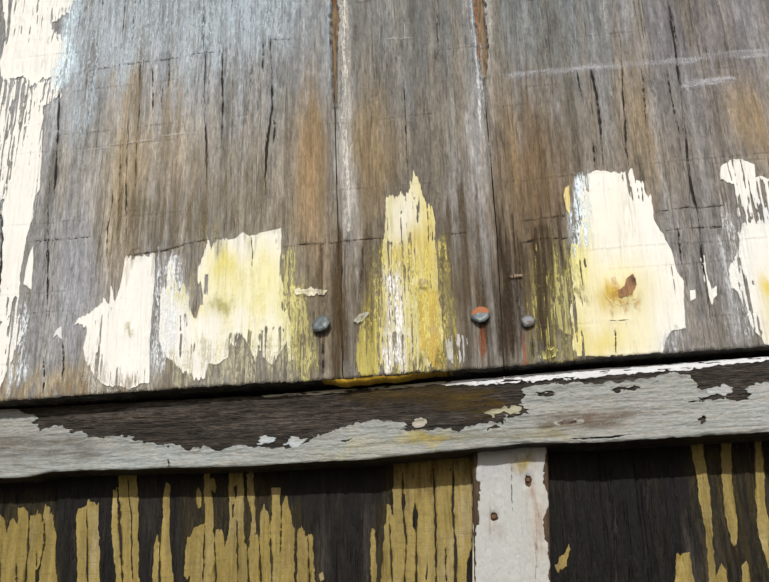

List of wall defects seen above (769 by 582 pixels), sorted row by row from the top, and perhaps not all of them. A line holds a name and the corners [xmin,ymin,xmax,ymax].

peeling [0,0,73,388]
crack [261,35,294,195]
peeling [0,159,769,582]